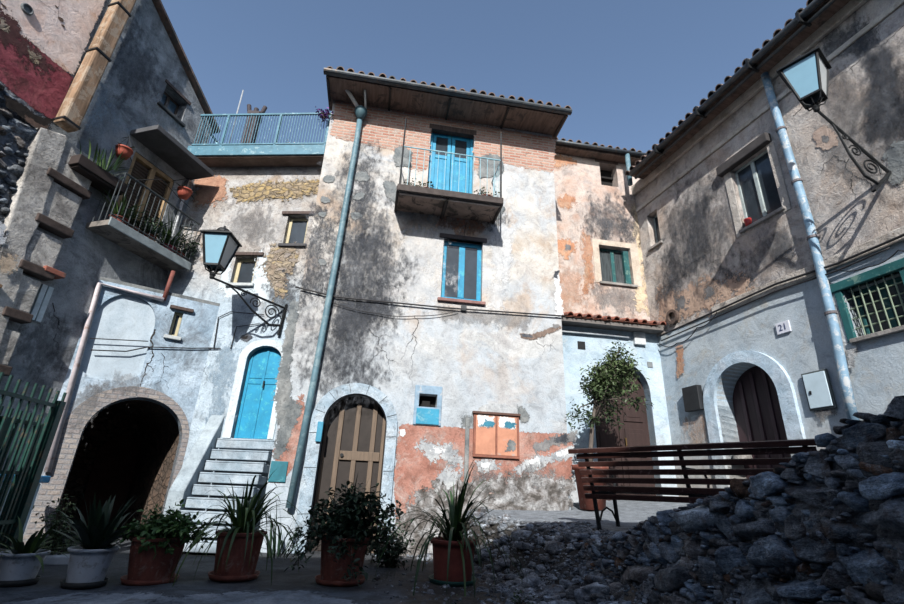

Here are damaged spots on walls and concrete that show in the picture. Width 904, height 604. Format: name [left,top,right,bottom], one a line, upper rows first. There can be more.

peeling [0,3,63,85]
spalling [4,95,55,129]
leakage [823,12,904,192]
peeling [0,217,20,275]
leakage [261,145,416,395]
peeling [557,238,576,260]
leakage [655,176,735,306]
crack [140,329,172,389]
peeling [414,435,464,490]
peeling [475,458,503,475]
peeling [513,429,579,477]